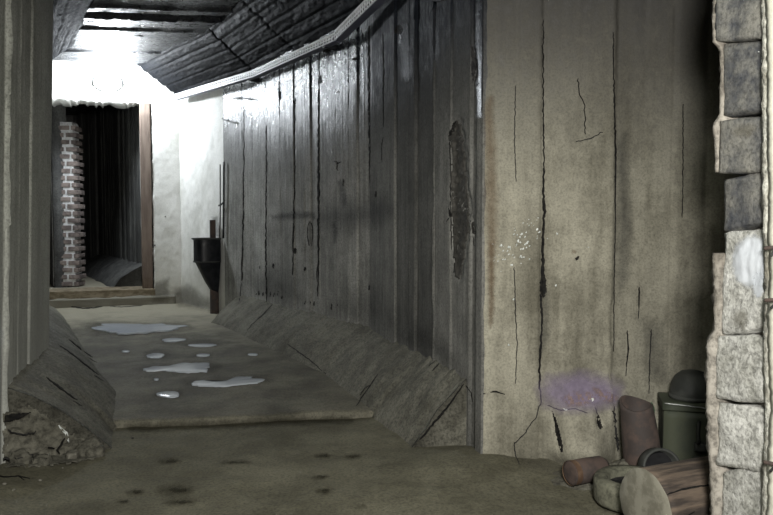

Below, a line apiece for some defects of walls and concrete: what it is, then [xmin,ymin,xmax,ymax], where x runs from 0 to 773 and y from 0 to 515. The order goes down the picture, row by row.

crack [511,86,519,181]
crack [576,79,603,142]
spalling [446,121,475,279]
crack [514,20,547,463]
crack [511,268,519,384]
spalling [2,405,106,467]
crack [356,374,378,406]